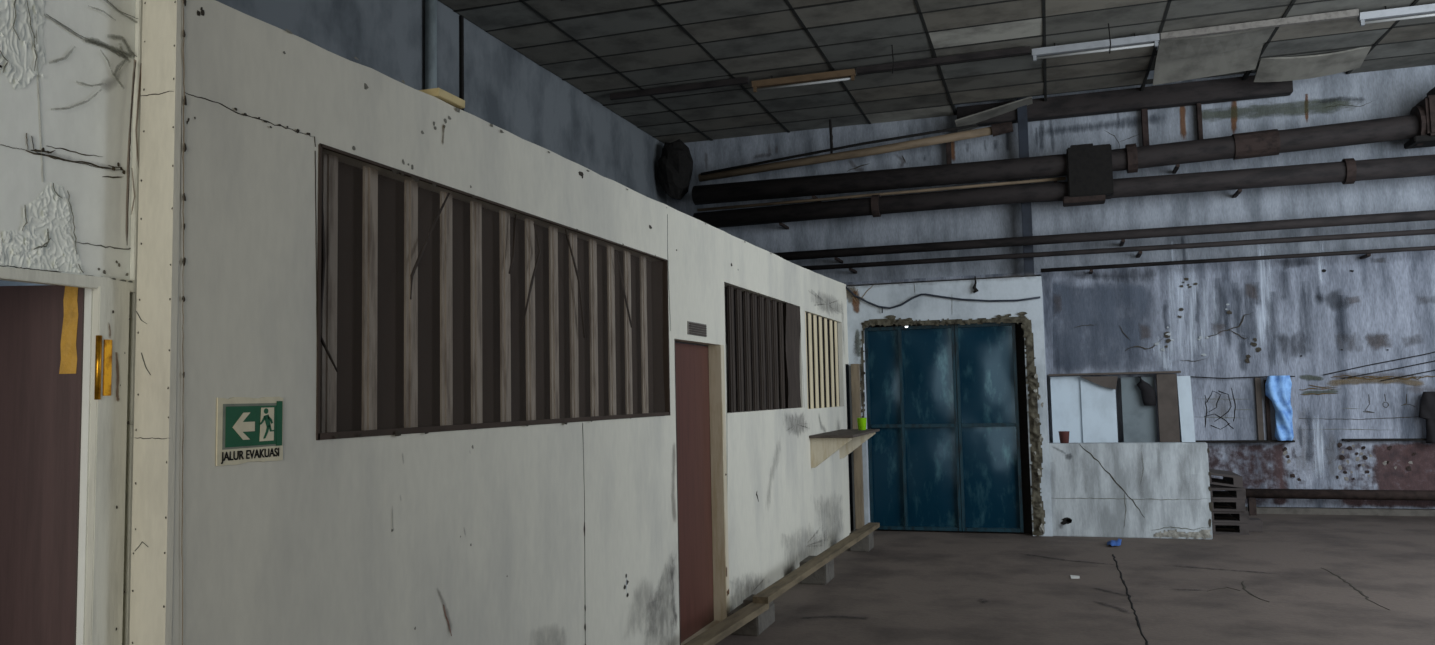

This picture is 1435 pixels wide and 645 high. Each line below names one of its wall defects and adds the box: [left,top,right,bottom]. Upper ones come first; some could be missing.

damp [1053,284,1147,369]
peeling [1154,444,1301,539]
peeling [1336,441,1435,508]
crack [1080,445,1148,645]